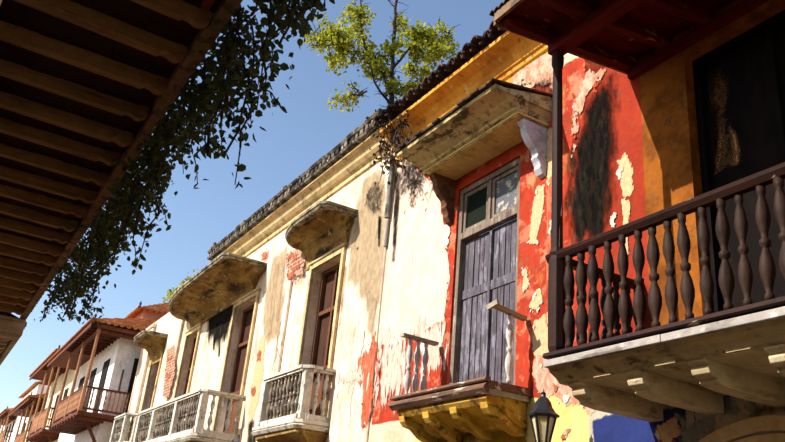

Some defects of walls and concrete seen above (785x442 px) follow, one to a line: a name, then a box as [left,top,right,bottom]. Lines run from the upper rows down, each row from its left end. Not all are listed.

peeling [569,69,606,158]
water stain [564,77,616,242]
peeling [610,153,634,228]
water stain [208,305,233,356]
spalling [285,249,305,282]
water stain [348,165,425,335]
peeling [337,164,450,430]
peeling [521,113,595,416]
peeling [654,417,681,442]